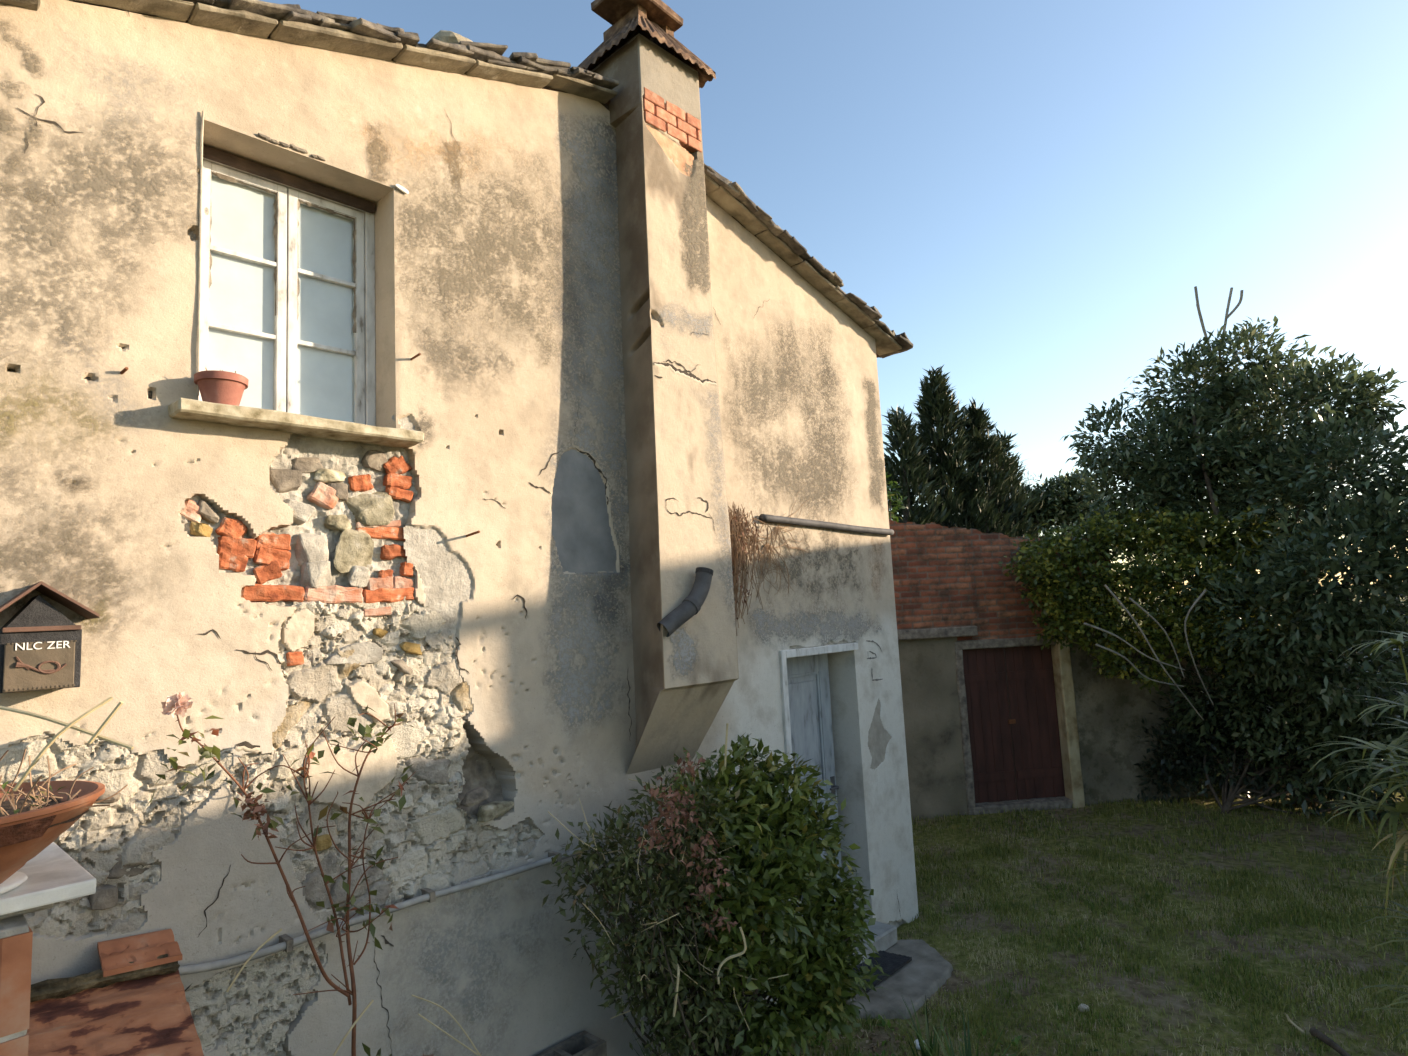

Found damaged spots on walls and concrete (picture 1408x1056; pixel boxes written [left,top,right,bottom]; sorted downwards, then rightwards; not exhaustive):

crack [17,94,83,154]
flaking render [643,87,702,177]
leakage [0,81,191,352]
leakage [680,160,711,292]
crack [654,309,721,386]
peeling [551,449,617,573]
crack [666,497,715,531]
leakage [709,334,844,603]
leakage [863,381,885,505]
flaking render [0,434,543,938]
peeling [868,699,892,770]
flaking render [184,941,327,1056]